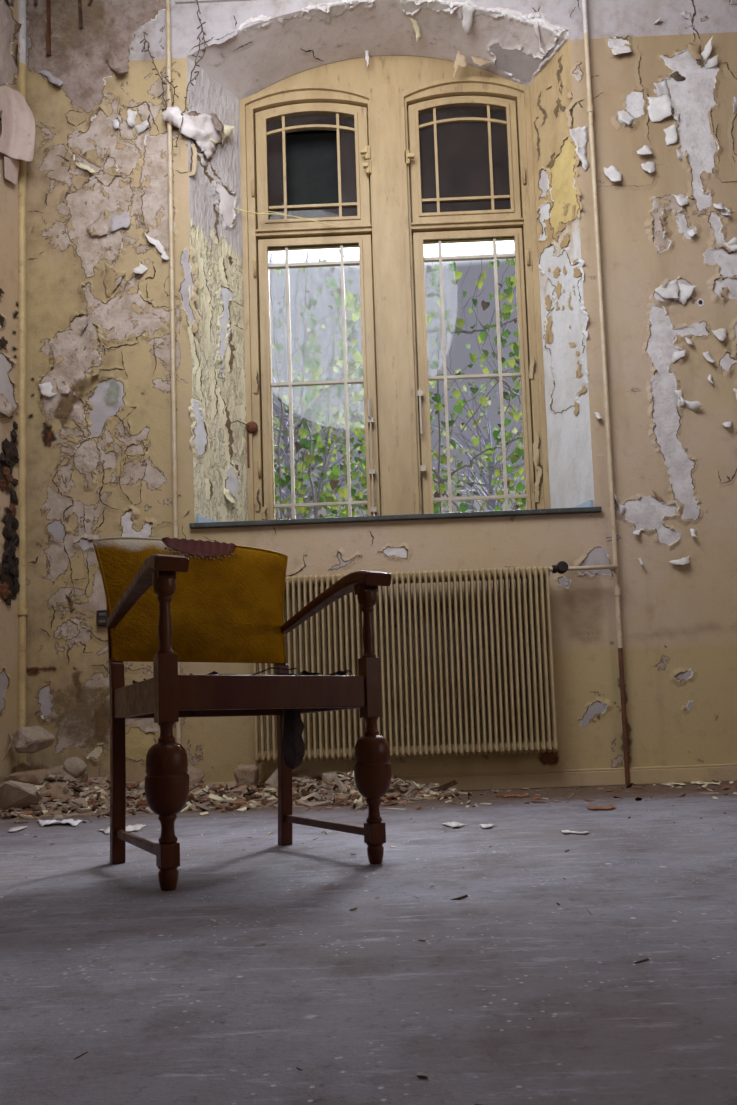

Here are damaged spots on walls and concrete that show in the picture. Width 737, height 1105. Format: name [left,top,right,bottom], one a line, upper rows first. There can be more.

peeling [238,0,376,34]
peeling [398,0,569,85]
crack [687,0,702,44]
crack [708,62,737,183]
spalling [0,0,240,492]
peeling [536,126,589,416]
peeling [552,36,737,592]
peeling [223,462,241,503]
peeling [116,504,158,538]
peeling [377,541,414,563]
peeling [34,677,58,725]
peeling [125,724,160,767]